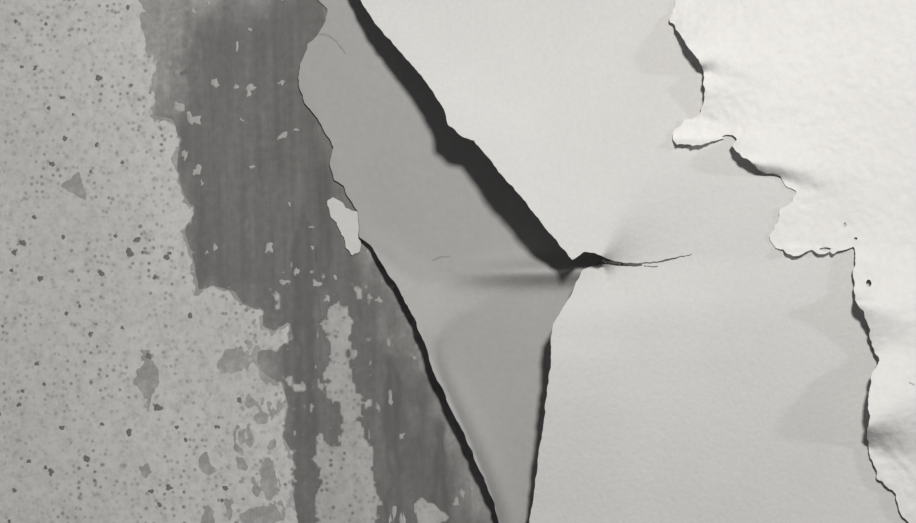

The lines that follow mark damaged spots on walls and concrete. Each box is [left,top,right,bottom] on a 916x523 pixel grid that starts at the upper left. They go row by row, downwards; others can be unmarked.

peeling [61,172,86,200]
peeling [133,350,159,409]
damp [183,0,444,523]
peeling [139,0,612,523]
peeling [361,0,916,523]
crack [602,254,692,267]